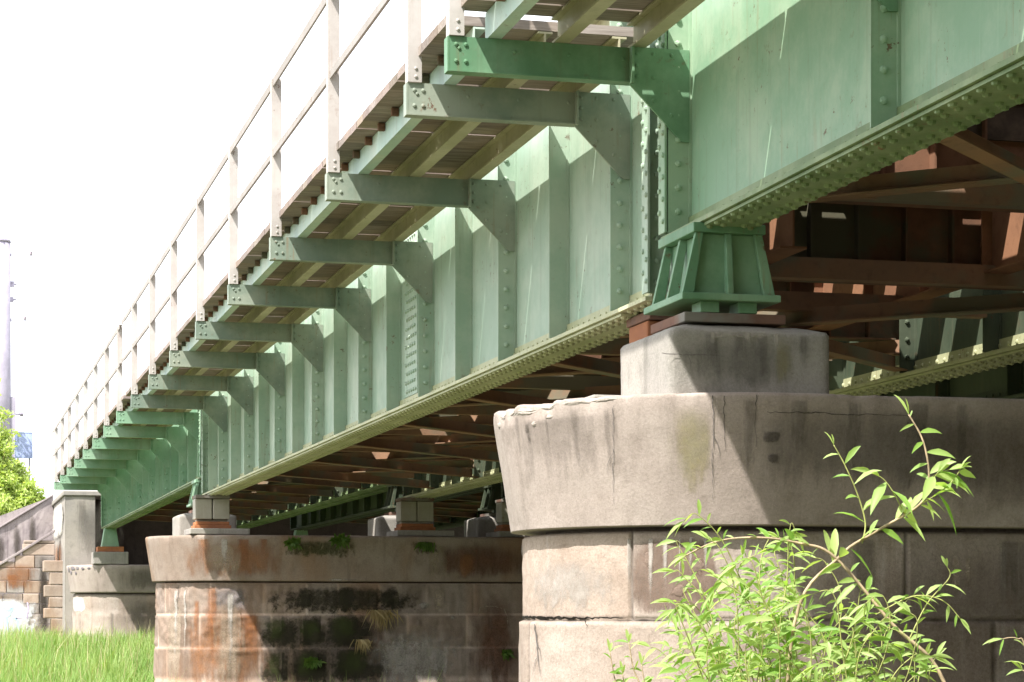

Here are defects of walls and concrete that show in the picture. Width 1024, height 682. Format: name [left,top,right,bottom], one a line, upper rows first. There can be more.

spalling [497,397,619,429]
crack [754,395,912,445]
crack [712,395,726,497]
damp [382,589,399,610]
rust [192,590,258,682]